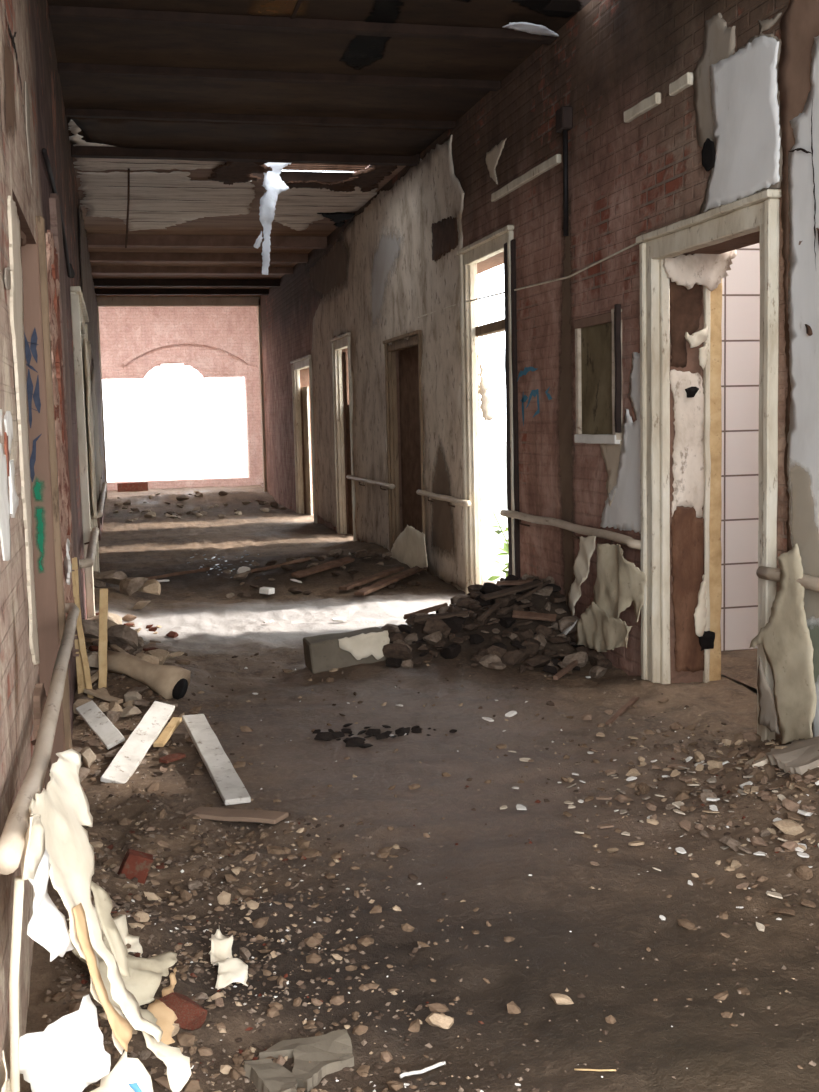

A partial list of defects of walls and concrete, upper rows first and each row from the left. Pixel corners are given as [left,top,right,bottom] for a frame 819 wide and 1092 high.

crack [0,11,29,204]
flaking render [0,196,40,665]
spalling [45,193,82,657]
peeling [68,120,255,541]
flaking render [274,135,465,589]
flaking render [693,0,819,578]
flaking render [33,683,47,740]
flaking render [41,761,51,792]
flaking render [803,588,819,737]